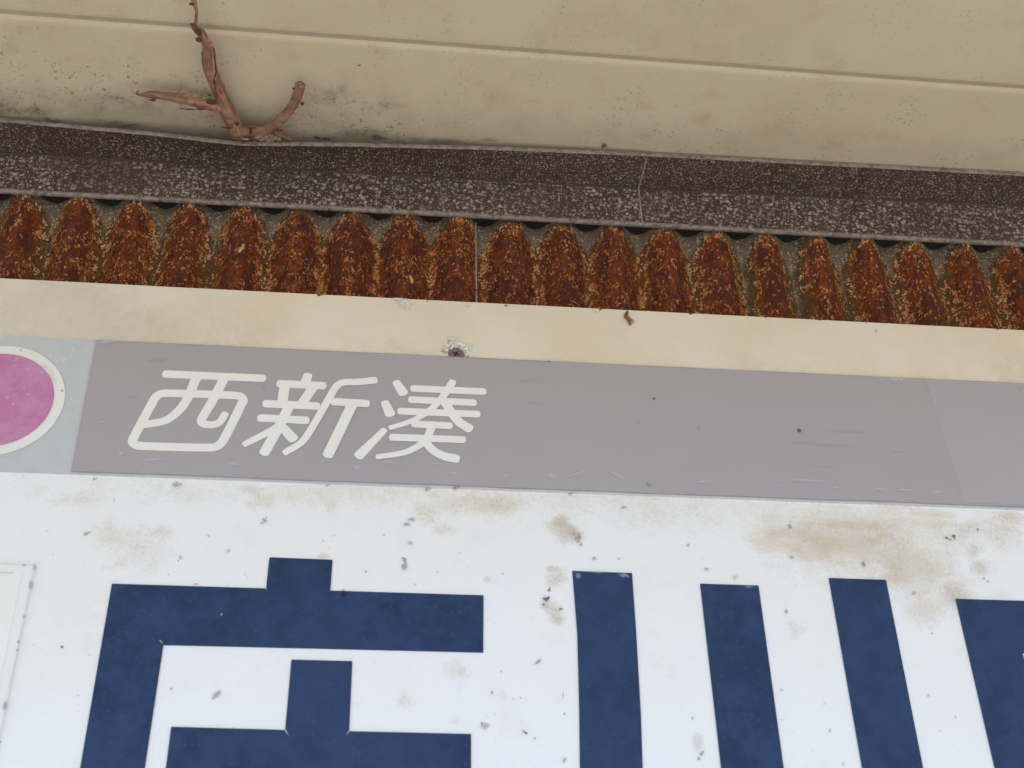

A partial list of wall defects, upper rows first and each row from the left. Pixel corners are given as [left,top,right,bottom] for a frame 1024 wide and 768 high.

rust [0,195,1024,330]